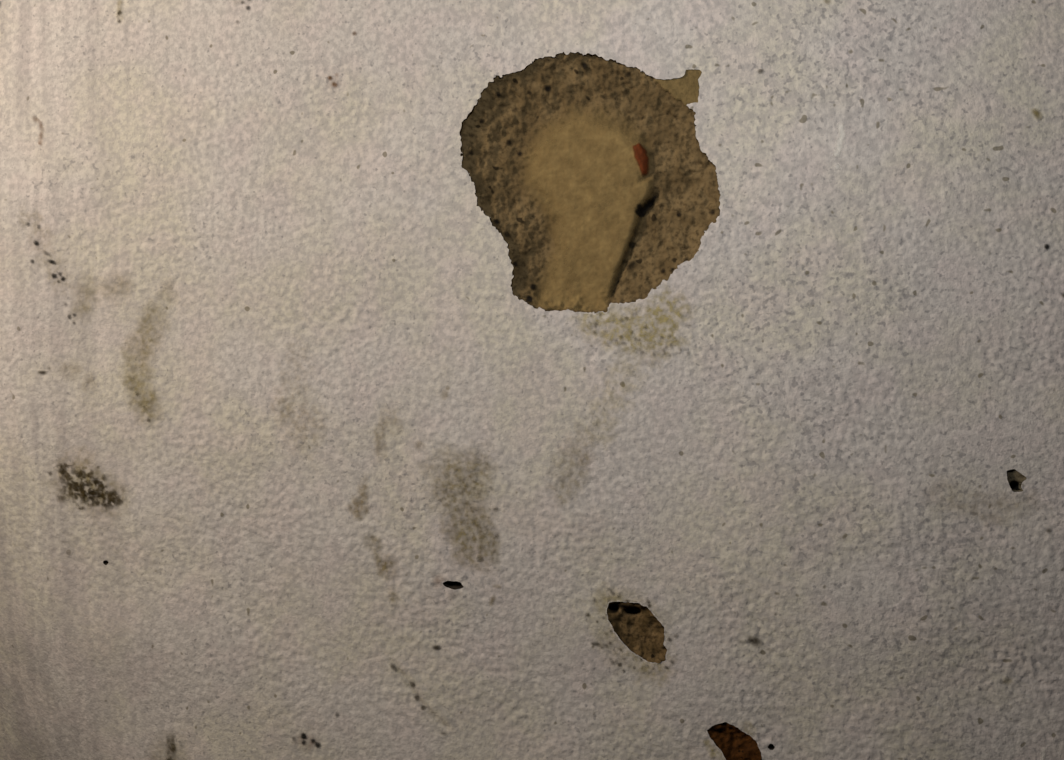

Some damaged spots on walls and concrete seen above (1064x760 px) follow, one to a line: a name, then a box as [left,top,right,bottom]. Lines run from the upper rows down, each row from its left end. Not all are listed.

spalling [459,52,721,313]
damp [49,464,121,509]
damp [443,464,495,562]
peeling [1007,469,1027,492]
spalling [607,602,667,663]
spalling [707,722,775,760]